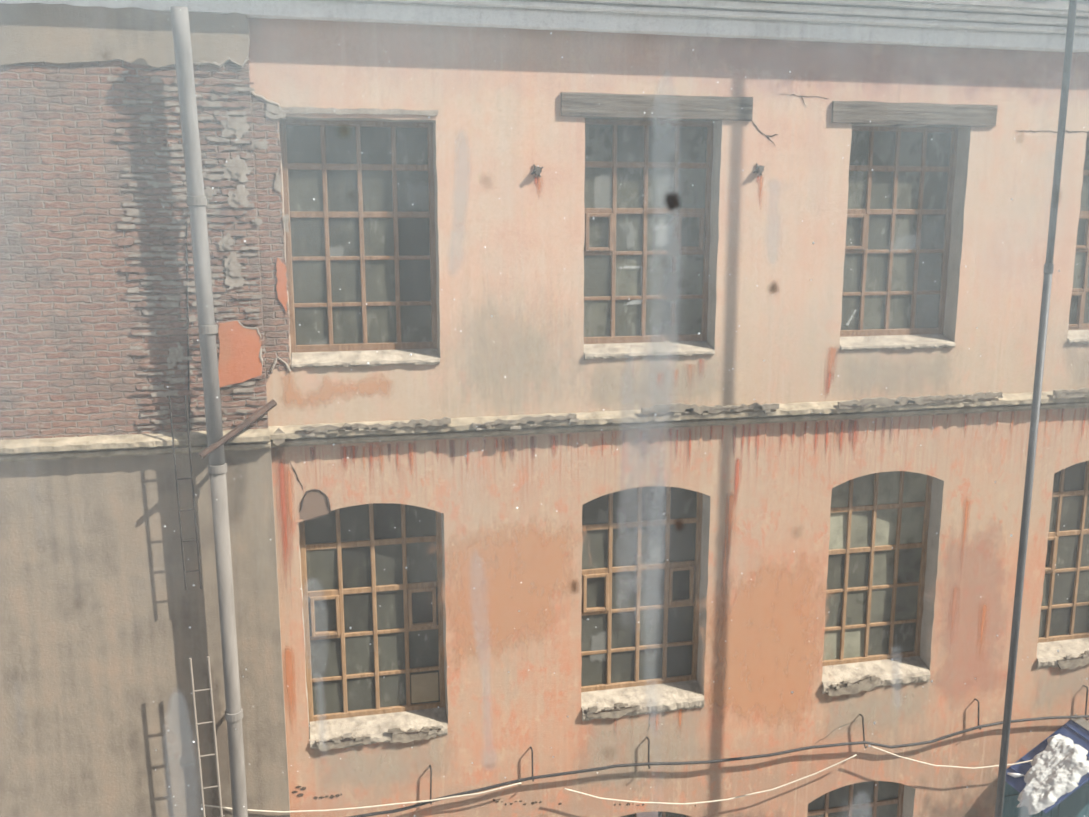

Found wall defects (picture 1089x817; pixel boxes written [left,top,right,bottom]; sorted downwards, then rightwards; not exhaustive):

crack [752,121,778,145]